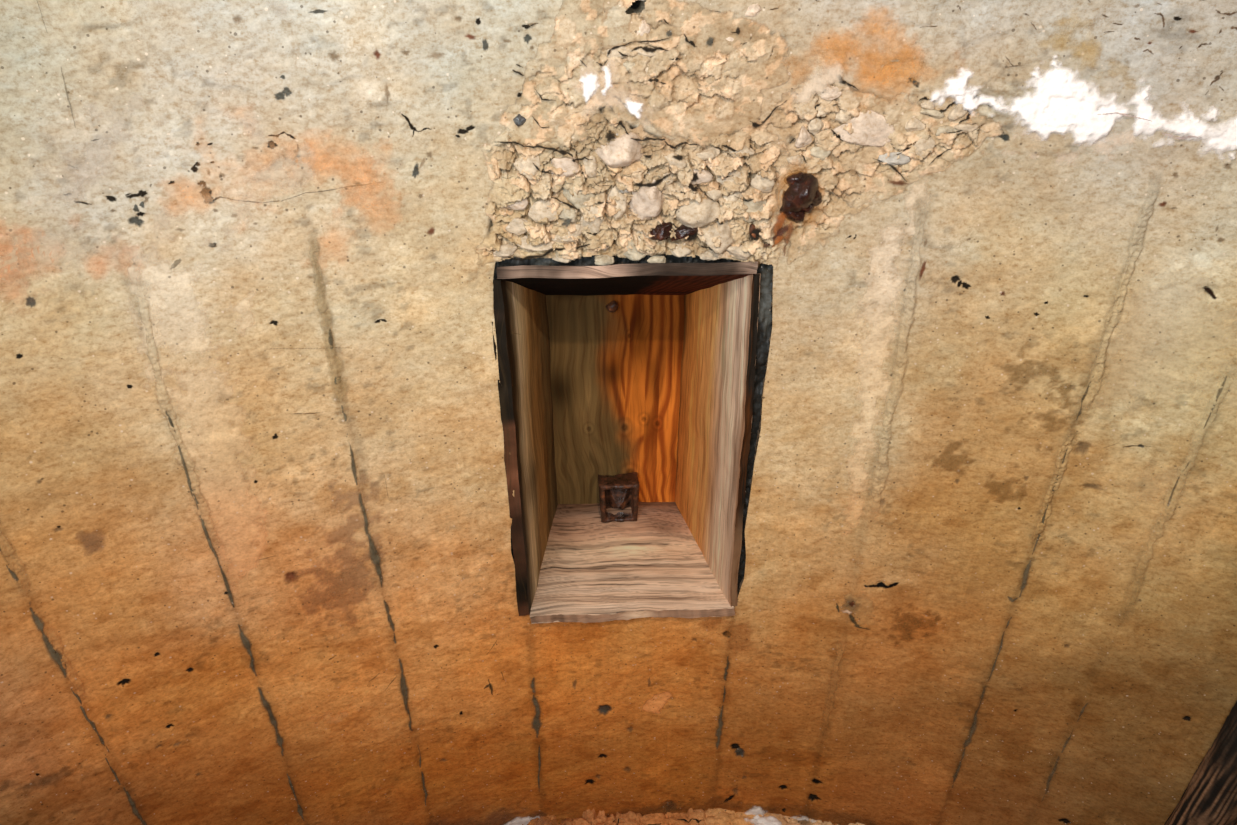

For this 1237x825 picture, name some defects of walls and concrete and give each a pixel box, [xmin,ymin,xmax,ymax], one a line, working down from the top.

water stain [931,56,1237,159]
spalling [476,0,1003,535]
crack [1204,377,1227,427]
crack [0,549,18,581]
crack [30,608,147,825]
crack [166,412,304,820]
crack [280,330,428,806]
crack [952,450,1067,788]
crack [1043,703,1088,798]